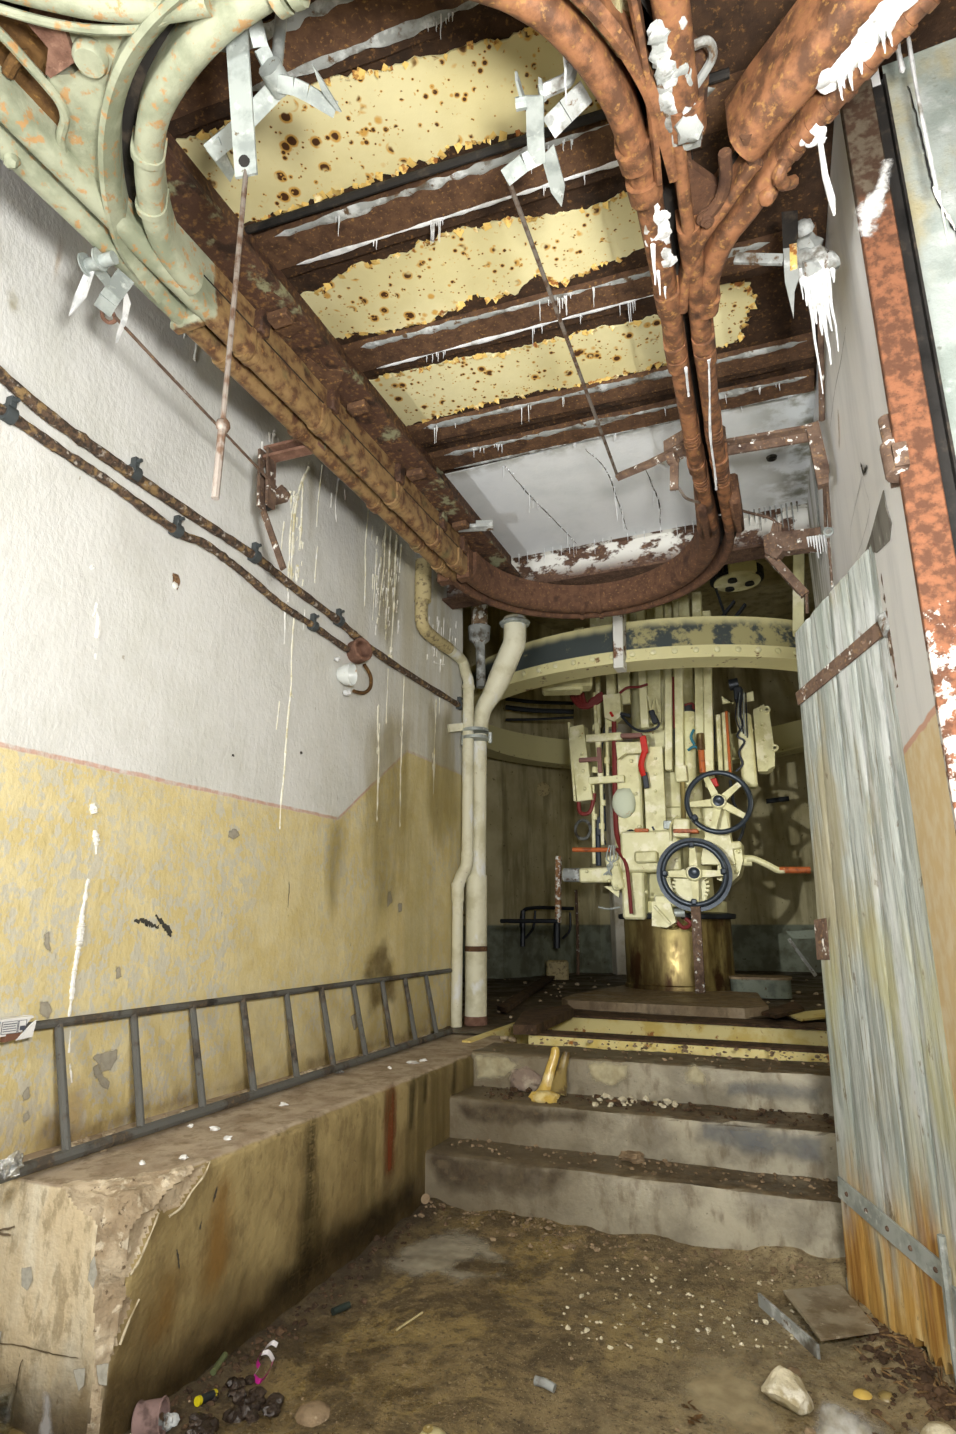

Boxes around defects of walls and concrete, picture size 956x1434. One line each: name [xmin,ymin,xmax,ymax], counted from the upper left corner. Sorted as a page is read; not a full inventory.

crack [907,86,956,243]
water stain [276,464,346,829]
water stain [364,509,405,827]
peeling [21,1267,32,1290]
spalling [61,1161,210,1434]
water stain [163,1128,413,1396]
rust [385,1085,395,1174]
water stain [390,1232,499,1279]